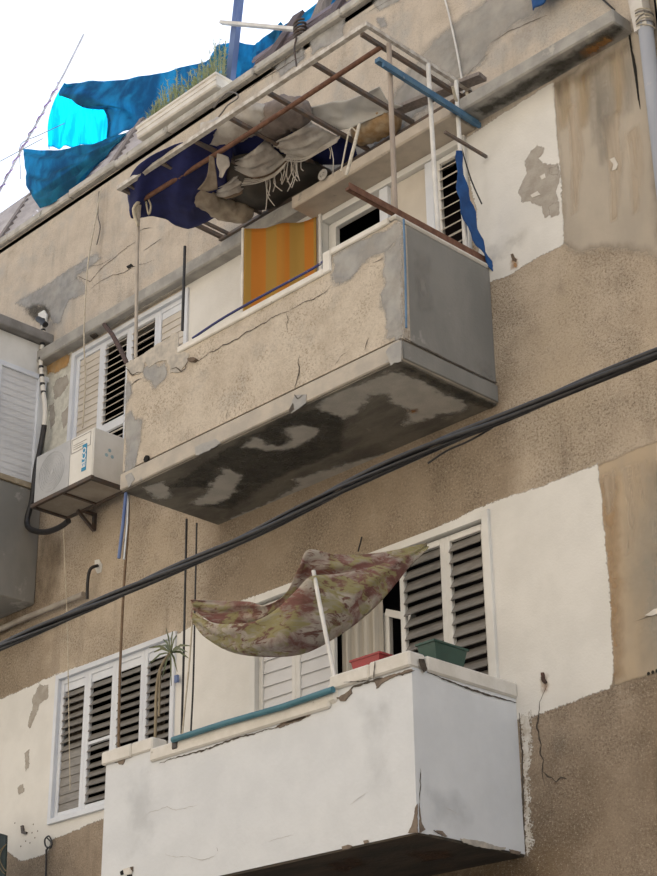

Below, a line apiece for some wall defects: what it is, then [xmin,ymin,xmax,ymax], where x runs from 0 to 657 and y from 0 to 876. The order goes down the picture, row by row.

peeling [518,145,560,218]
flaking render [124,333,198,385]
water stain [403,367,494,408]
water stain [175,409,343,509]
peeling [28,685,48,728]
crack [160,715,310,763]
crack [337,659,516,703]
crack [536,672,566,786]
flaking render [408,769,447,837]
peeling [461,711,537,856]